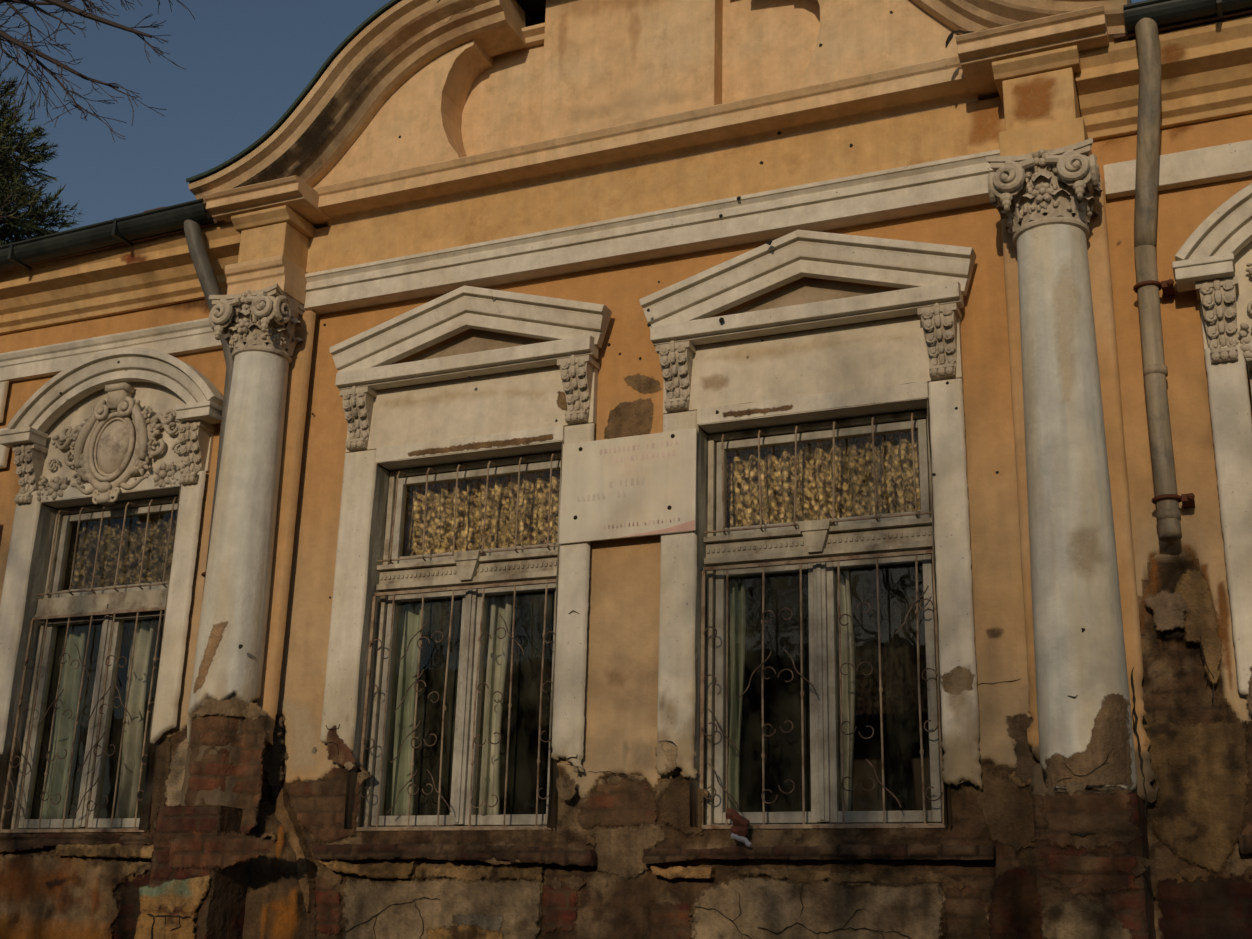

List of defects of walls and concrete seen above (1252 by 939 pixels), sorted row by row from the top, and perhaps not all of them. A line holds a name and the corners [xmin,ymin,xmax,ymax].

leakage [234,59,378,188]
flaking render [604,357,661,439]
peeling [941,666,975,694]
flaking render [150,621,374,871]
flaking render [1006,693,1143,852]
flaking render [556,766,710,879]
flaking render [112,870,151,939]
crack [345,897,440,939]
crack [696,881,911,939]
flaking render [1156,866,1252,939]